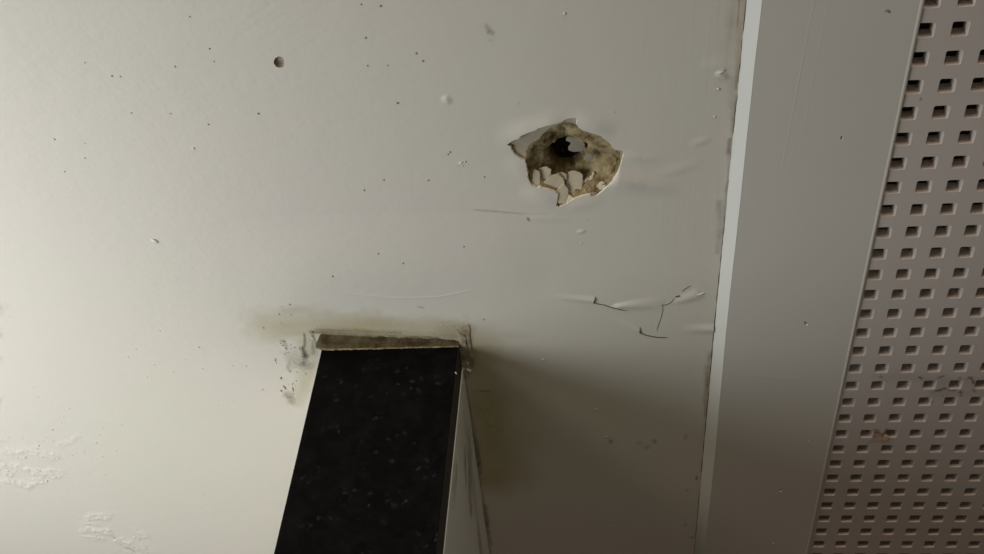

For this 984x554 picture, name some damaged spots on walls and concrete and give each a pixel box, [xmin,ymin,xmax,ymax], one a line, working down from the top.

hole [490,103,644,217]
crack [593,286,690,338]
crack [694,219,725,550]